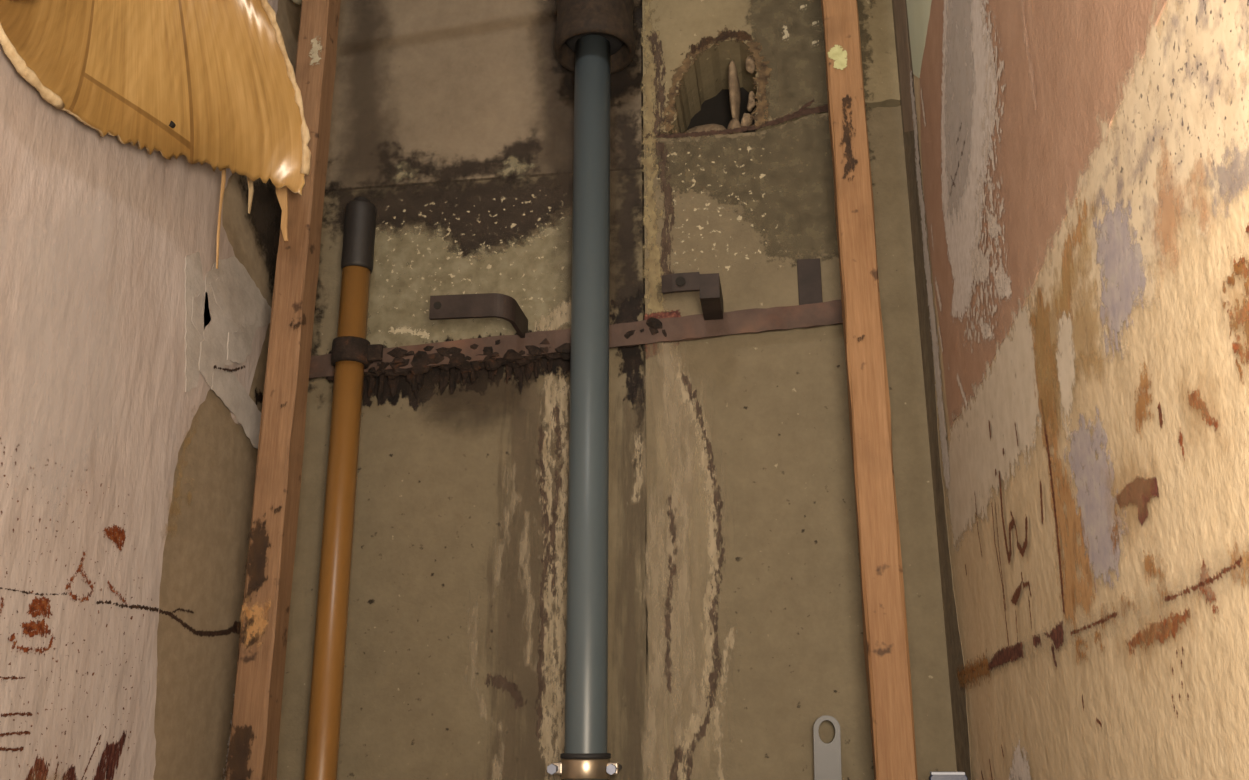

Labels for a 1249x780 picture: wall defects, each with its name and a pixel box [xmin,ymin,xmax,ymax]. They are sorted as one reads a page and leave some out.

spalling [659,27,773,136]
peeling [910,0,1012,489]
corrosion [362,338,571,406]
corrosion [1223,256,1249,383]
corrosion [0,438,148,780]
crack [96,600,241,637]
water stain [466,373,570,780]
water stain [619,342,737,780]
crack [1070,612,1117,636]
corrosion [1111,476,1159,552]
crack [1164,556,1242,601]
peeling [1009,739,1031,780]